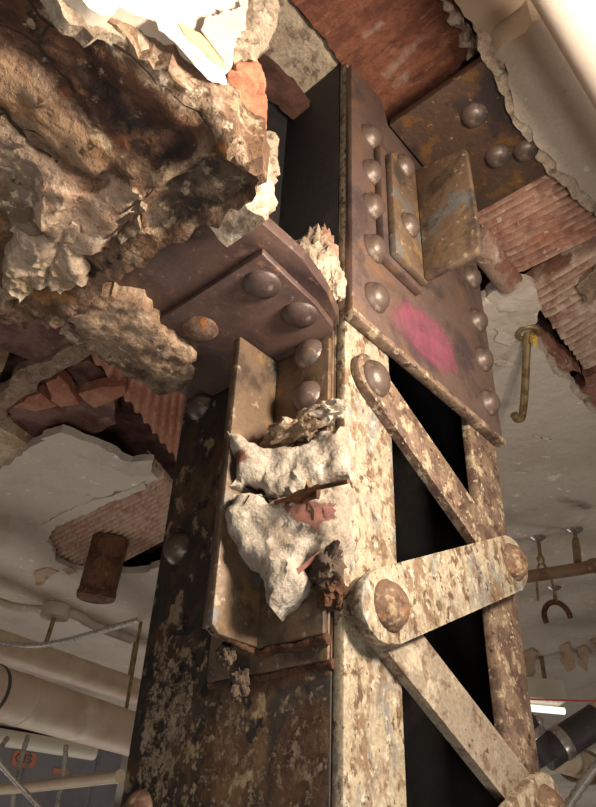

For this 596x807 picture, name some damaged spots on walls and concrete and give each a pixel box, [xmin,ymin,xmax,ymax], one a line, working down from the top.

crack [0,0,73,92]
crack [98,39,157,85]
peeling [153,0,248,85]
crack [0,107,58,163]
crack [173,95,212,131]
spalling [84,201,148,277]
spalling [532,330,596,414]
spalling [33,450,173,586]
corrosion [313,577,351,612]
corrosion [207,627,335,704]
corrosion [269,699,329,807]